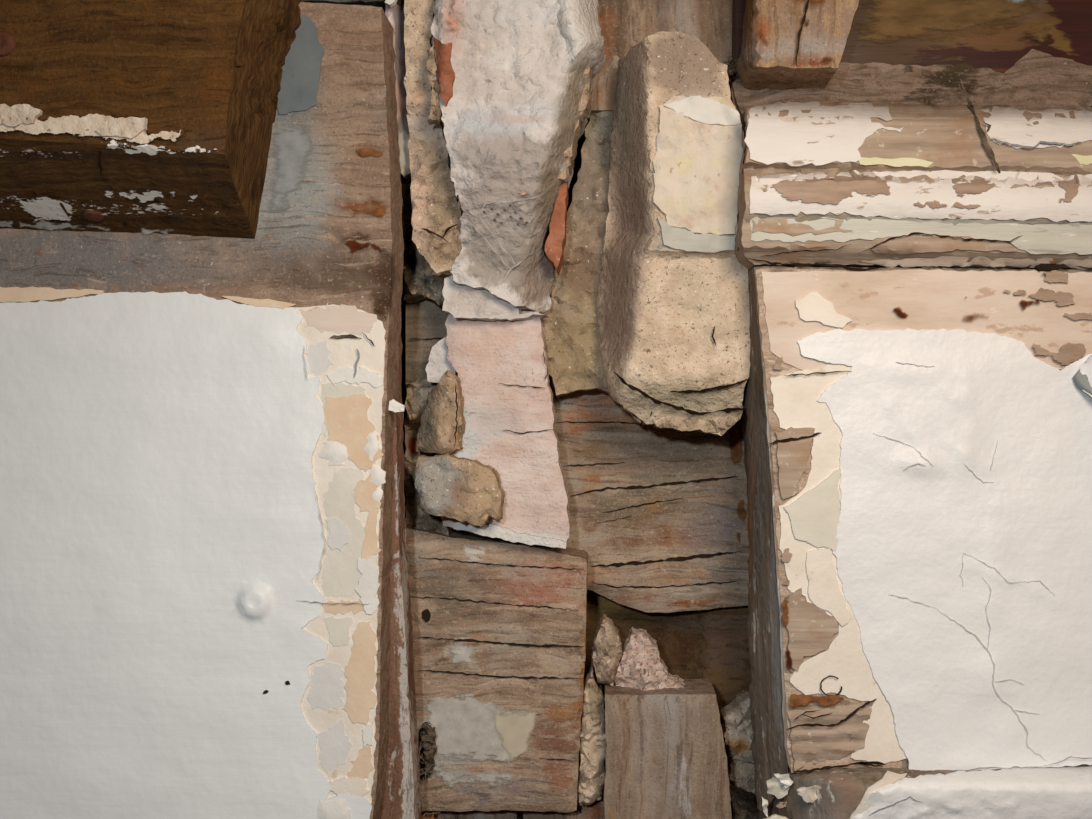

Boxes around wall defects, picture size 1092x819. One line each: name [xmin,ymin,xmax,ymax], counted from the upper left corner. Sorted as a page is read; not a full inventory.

peeling [0,190,203,231]
peeling [0,104,215,155]
corrosion [357,148,382,157]
peeling [652,95,743,253]
peeling [763,174,891,205]
peeling [914,179,996,210]
corrosion [345,240,381,253]
crack [874,433,933,471]
peeling [222,296,405,819]
peeling [775,427,851,671]
crack [888,554,1089,772]
spalling [761,699,875,819]